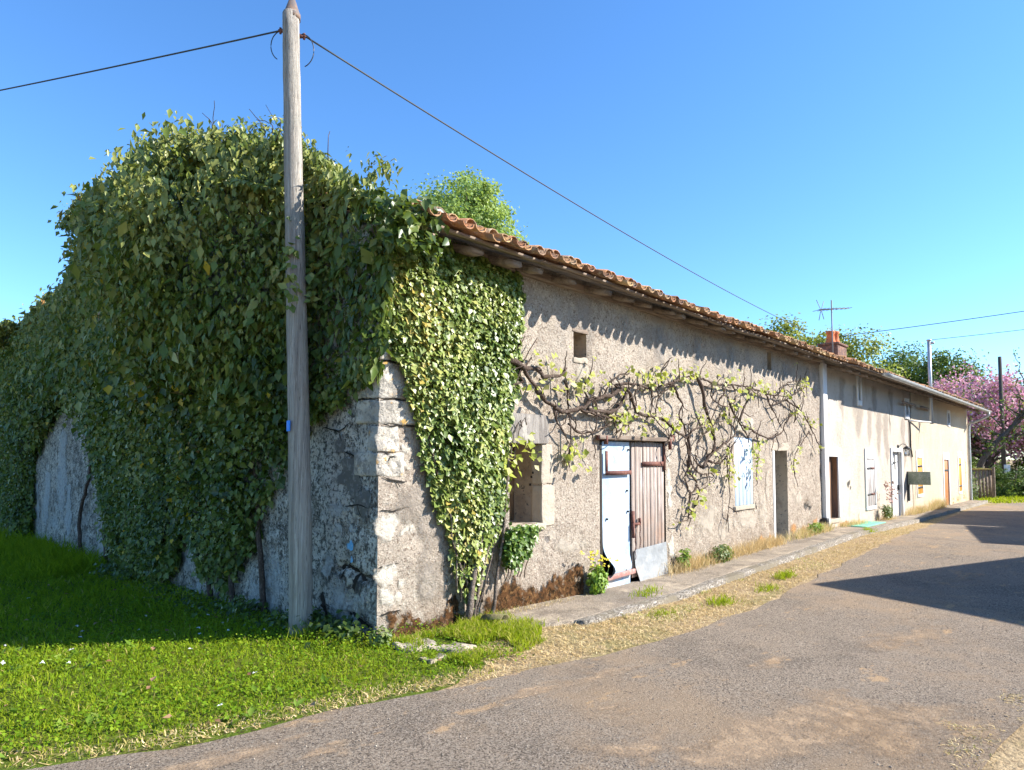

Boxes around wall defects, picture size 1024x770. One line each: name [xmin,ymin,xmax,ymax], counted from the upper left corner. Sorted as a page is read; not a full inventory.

crack [320,563,401,628]